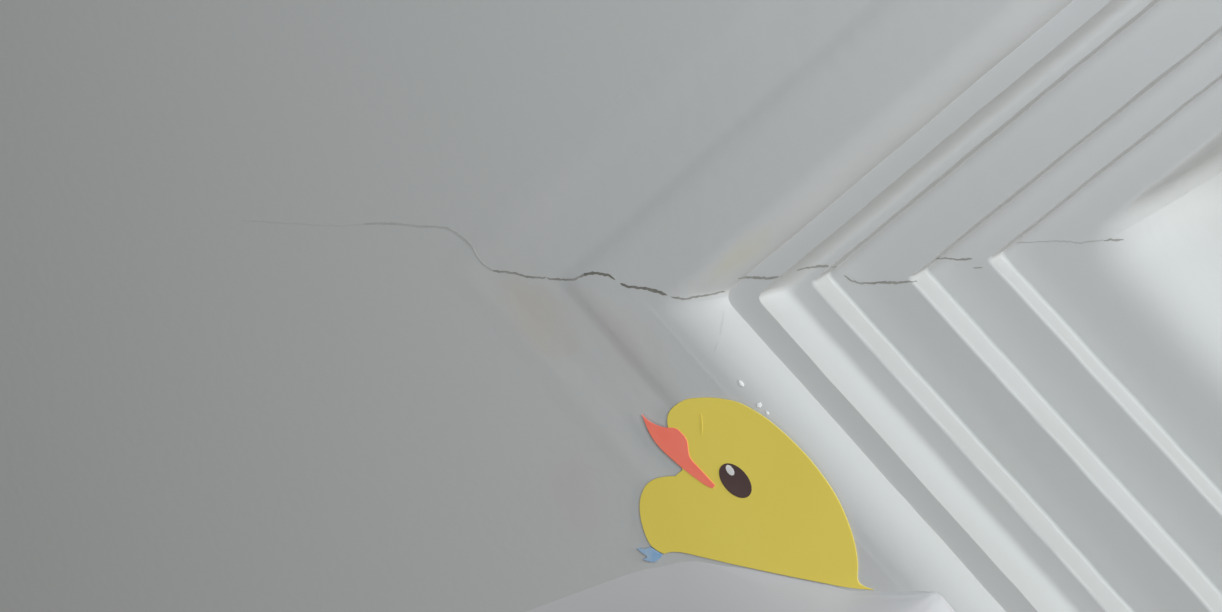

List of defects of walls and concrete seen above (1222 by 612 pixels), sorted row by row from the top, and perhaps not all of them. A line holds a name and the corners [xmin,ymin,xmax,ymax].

crack [1017,237,1124,245]
crack [243,220,917,300]
crack [936,257,982,268]